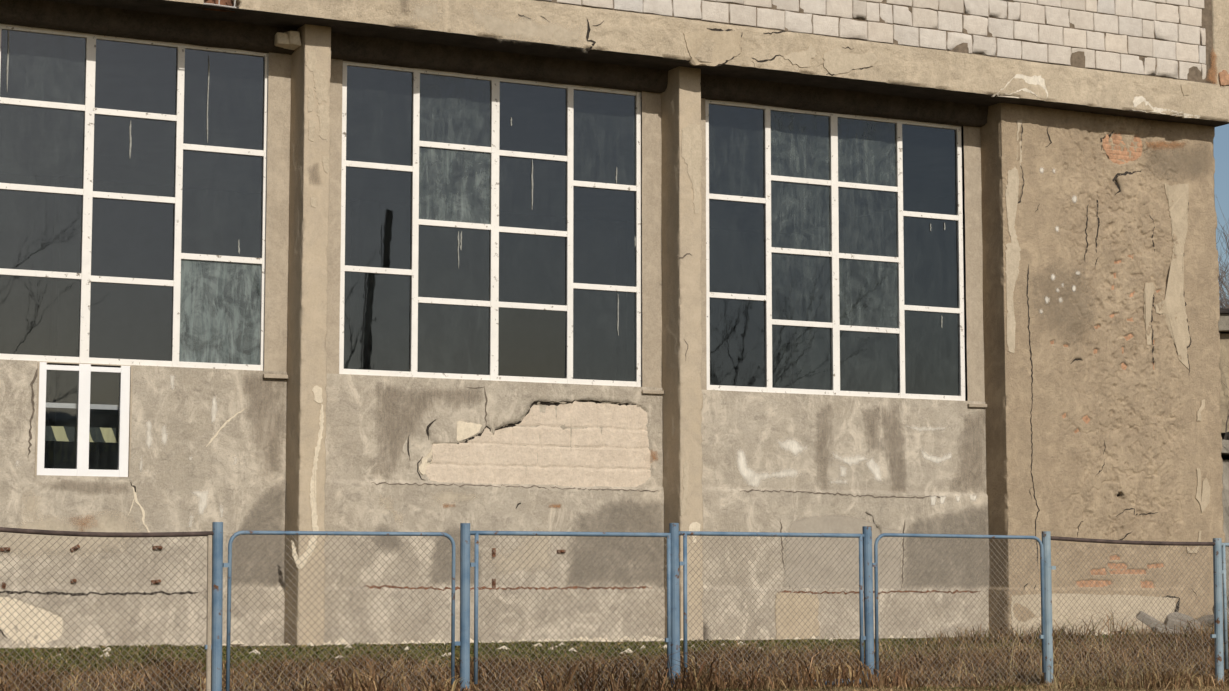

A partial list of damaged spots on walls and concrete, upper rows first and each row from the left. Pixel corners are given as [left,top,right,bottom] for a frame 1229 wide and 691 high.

spalling [202,0,236,12]
peeling [991,74,1048,101]
crack [1014,125,1052,212]
peeling [1094,183,1190,370]
crack [372,386,657,508]
spalling [419,401,656,487]
damp [737,450,797,487]
damp [779,440,803,455]
damp [831,454,882,483]
crack [1024,265,1040,590]
damp [784,495,987,588]
spalling [0,597,63,648]